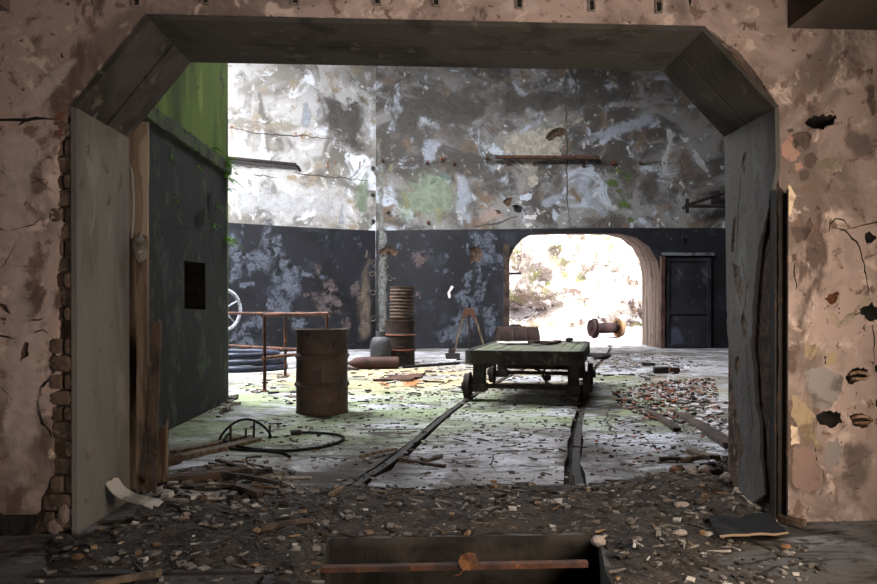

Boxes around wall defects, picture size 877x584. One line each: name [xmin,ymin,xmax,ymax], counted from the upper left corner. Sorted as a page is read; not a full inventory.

crack [0,218,42,269]
crack [829,218,877,359]